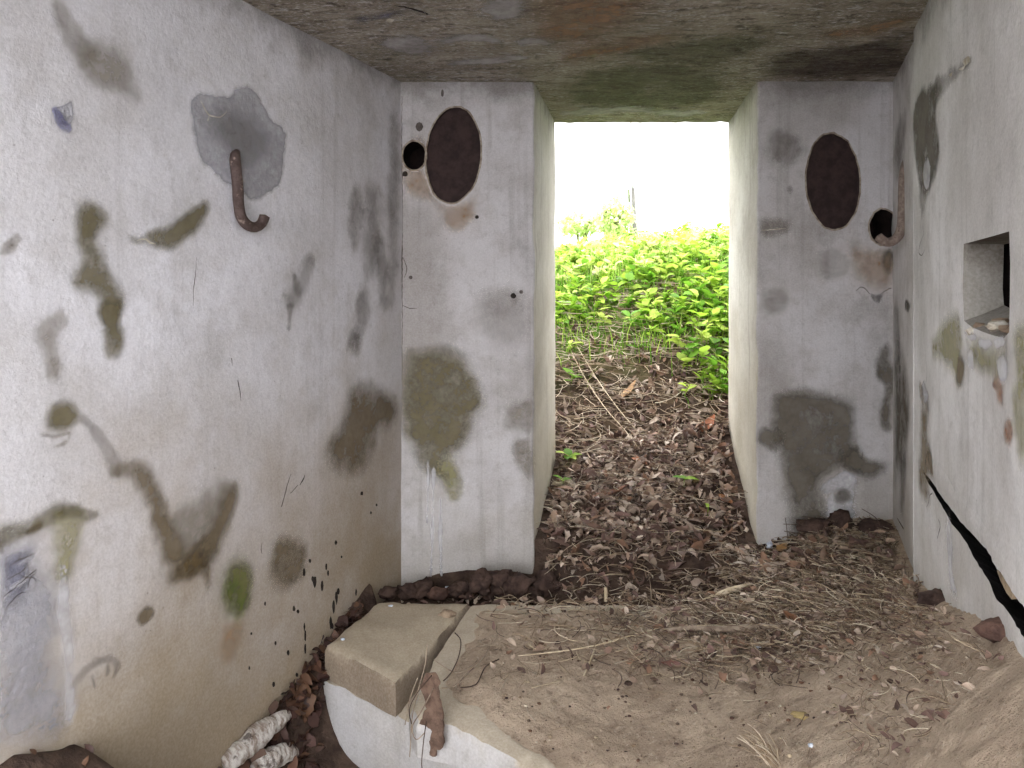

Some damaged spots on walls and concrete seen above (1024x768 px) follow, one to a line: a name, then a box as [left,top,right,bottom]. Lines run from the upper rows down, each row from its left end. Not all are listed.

water stain [913,84,940,194]
water stain [74,205,123,354]
water stain [137,203,207,248]
water stain [49,404,77,437]
water stain [116,464,237,579]
water stain [331,351,480,499]
water stain [759,391,884,532]
crack [920,449,1024,637]